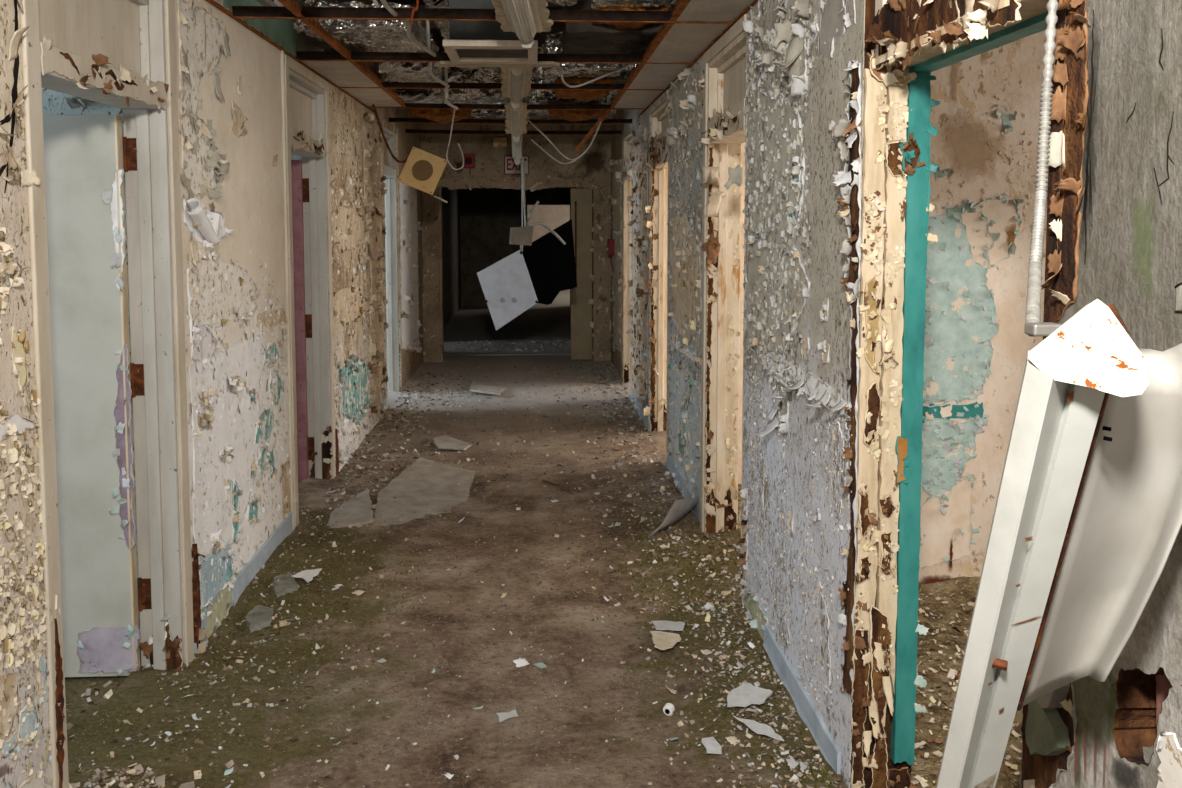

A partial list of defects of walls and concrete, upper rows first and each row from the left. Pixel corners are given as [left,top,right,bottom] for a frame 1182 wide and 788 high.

crack [0,0,40,193]
peeling [40,0,297,641]
peeling [291,0,1034,788]
peeling [0,227,60,788]
corrosion [54,618,65,788]
peeling [76,614,186,676]
spalling [1019,682,1080,788]
spalling [1112,667,1182,788]